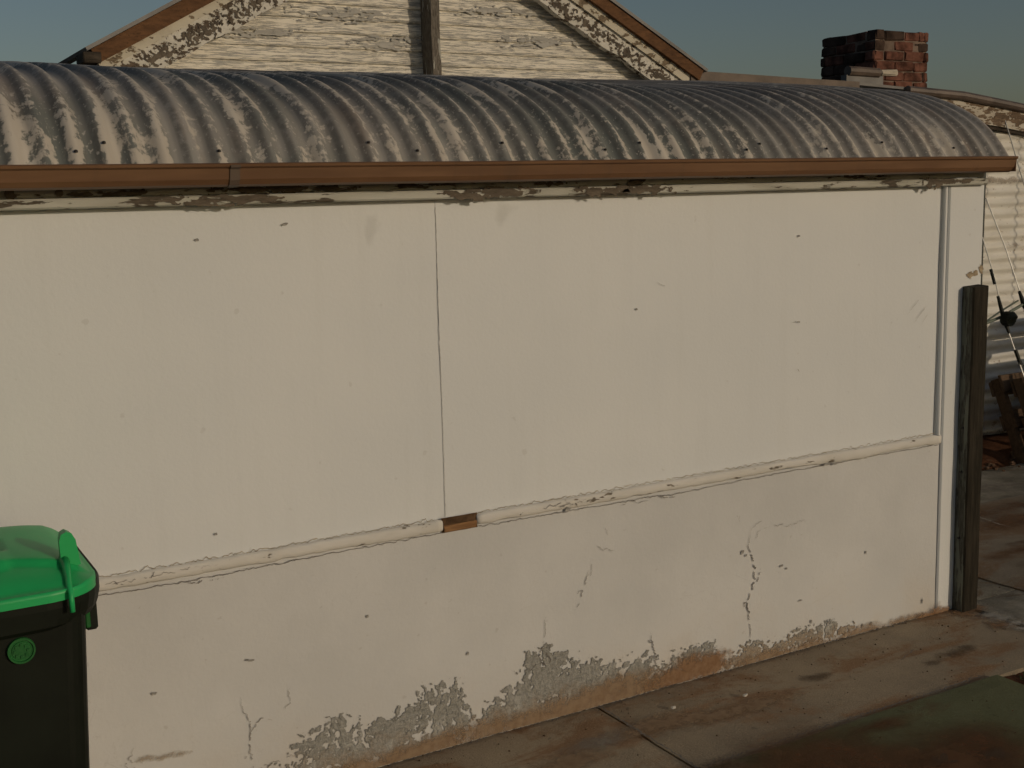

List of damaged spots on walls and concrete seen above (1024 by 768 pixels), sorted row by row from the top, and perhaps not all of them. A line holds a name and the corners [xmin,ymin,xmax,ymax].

peeling [125,0,422,68]
peeling [456,0,668,80]
peeling [116,185,361,207]
peeling [437,181,578,201]
peeling [922,177,972,190]
flaking render [267,619,872,768]